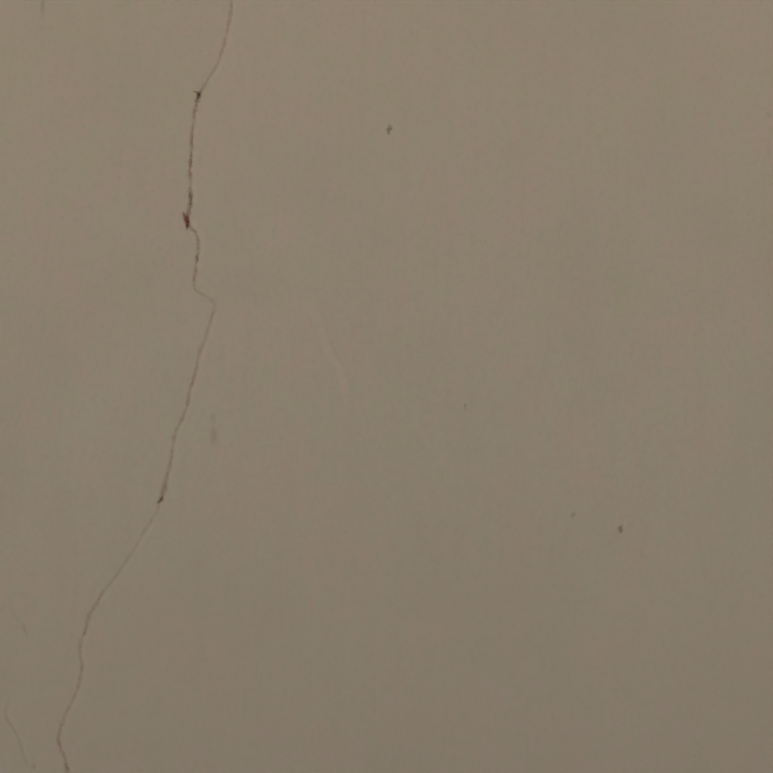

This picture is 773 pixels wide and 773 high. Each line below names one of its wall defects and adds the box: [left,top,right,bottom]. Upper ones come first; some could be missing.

crack [55,0,239,773]